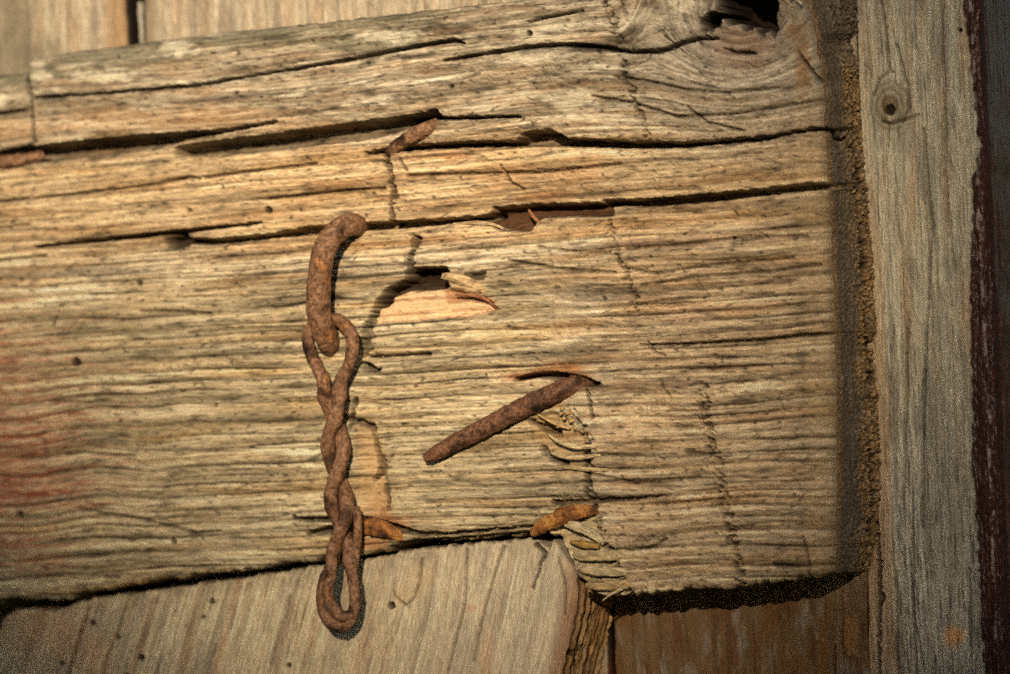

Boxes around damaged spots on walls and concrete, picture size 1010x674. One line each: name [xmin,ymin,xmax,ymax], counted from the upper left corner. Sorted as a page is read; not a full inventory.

crack [0,0,848,276]
crack [506,181,838,315]
crack [138,285,306,335]
rust [492,358,604,414]
crack [76,506,222,536]
crack [297,514,334,537]
rust [361,535,395,553]
rust [371,499,417,528]
crack [346,300,584,674]
crack [512,330,839,596]
crack [66,606,91,674]
crack [269,594,291,667]